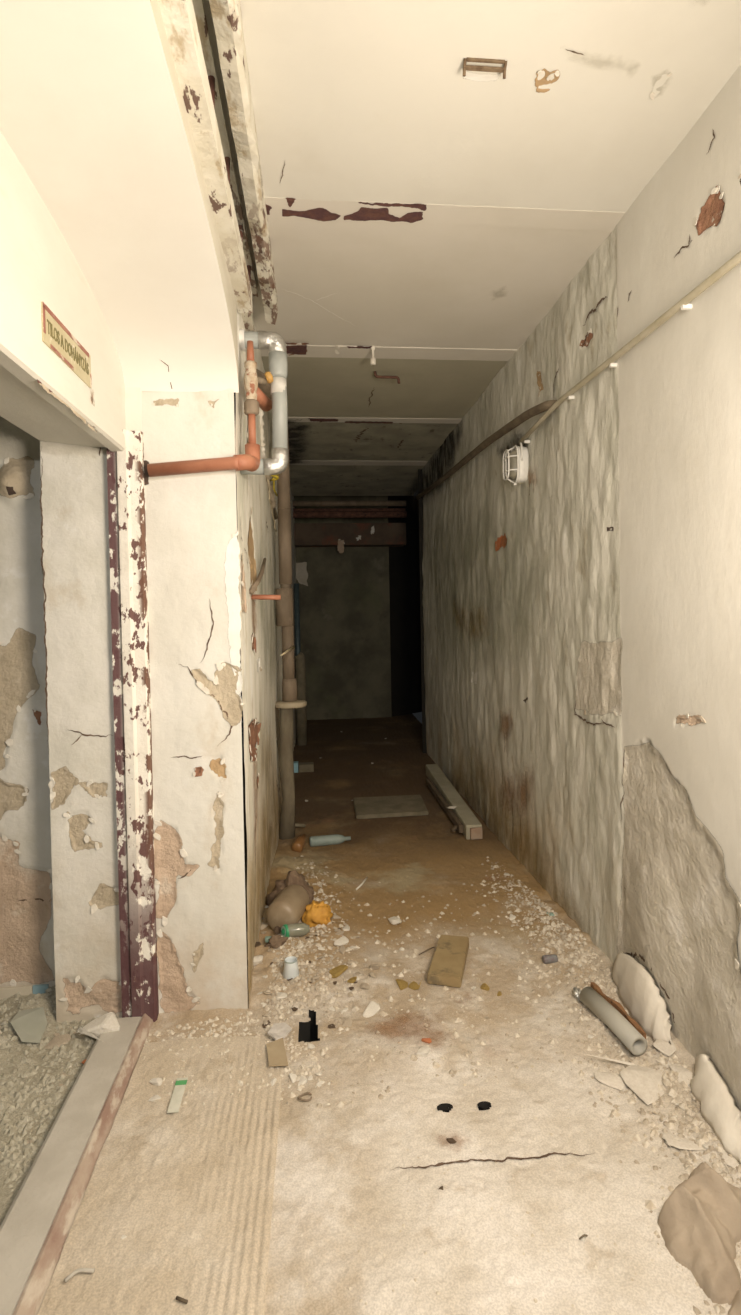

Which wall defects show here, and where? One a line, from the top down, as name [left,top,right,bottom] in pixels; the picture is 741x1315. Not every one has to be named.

spalling [535,69,560,93]
spalling [693,184,725,236]
spalling [0,628,122,1014]
spalling [153,758,227,1013]
spalling [617,742,741,1110]
crack [392,1152,593,1170]